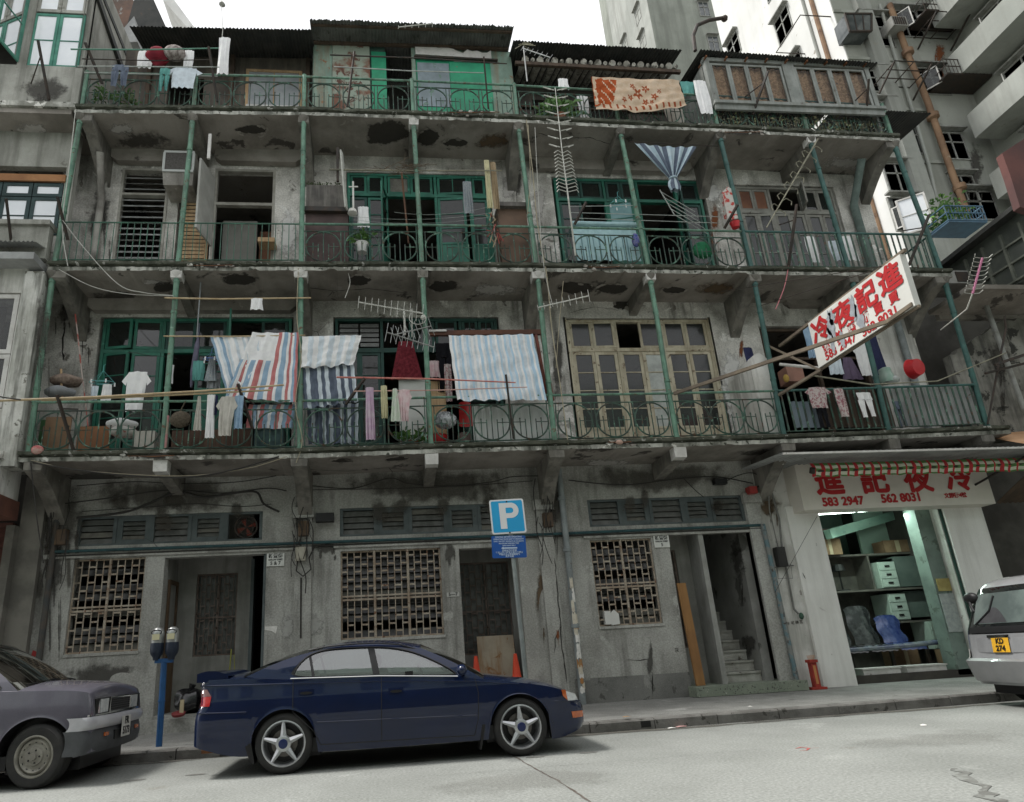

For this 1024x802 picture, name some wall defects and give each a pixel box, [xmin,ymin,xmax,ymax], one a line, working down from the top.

damp [26,79,67,101]
damp [475,134,508,148]
crack [554,558,567,682]